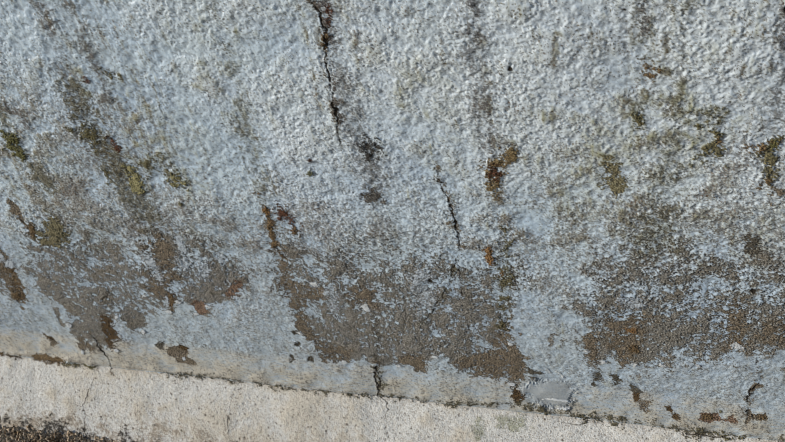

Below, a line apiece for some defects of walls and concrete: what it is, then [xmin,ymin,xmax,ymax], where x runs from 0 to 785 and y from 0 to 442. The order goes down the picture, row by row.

water stain [0,102,29,137]
water stain [25,157,59,195]
water stain [52,48,161,226]
corrosion [262,200,303,238]
crack [306,0,343,145]
crack [418,163,467,325]
corrosion [478,145,526,201]
water stain [487,225,518,332]
water stain [635,129,685,253]
crack [370,360,389,411]